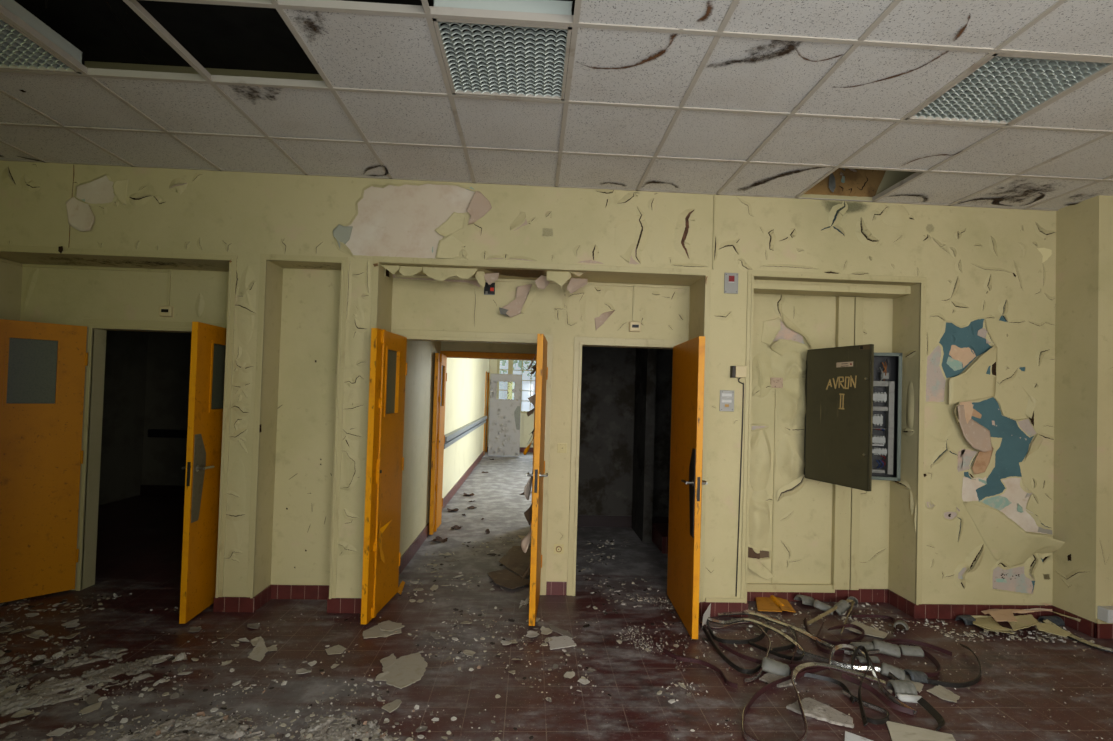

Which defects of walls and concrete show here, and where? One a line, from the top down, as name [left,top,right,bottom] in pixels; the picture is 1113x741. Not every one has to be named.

leakage [297,10,326,39]
peeling [66,174,128,231]
peeling [332,181,492,288]
leakage [961,180,1052,206]
crack [452,170,1056,388]
crack [340,426,362,490]
peeling [925,317,1053,536]
peeling [990,553,1052,595]